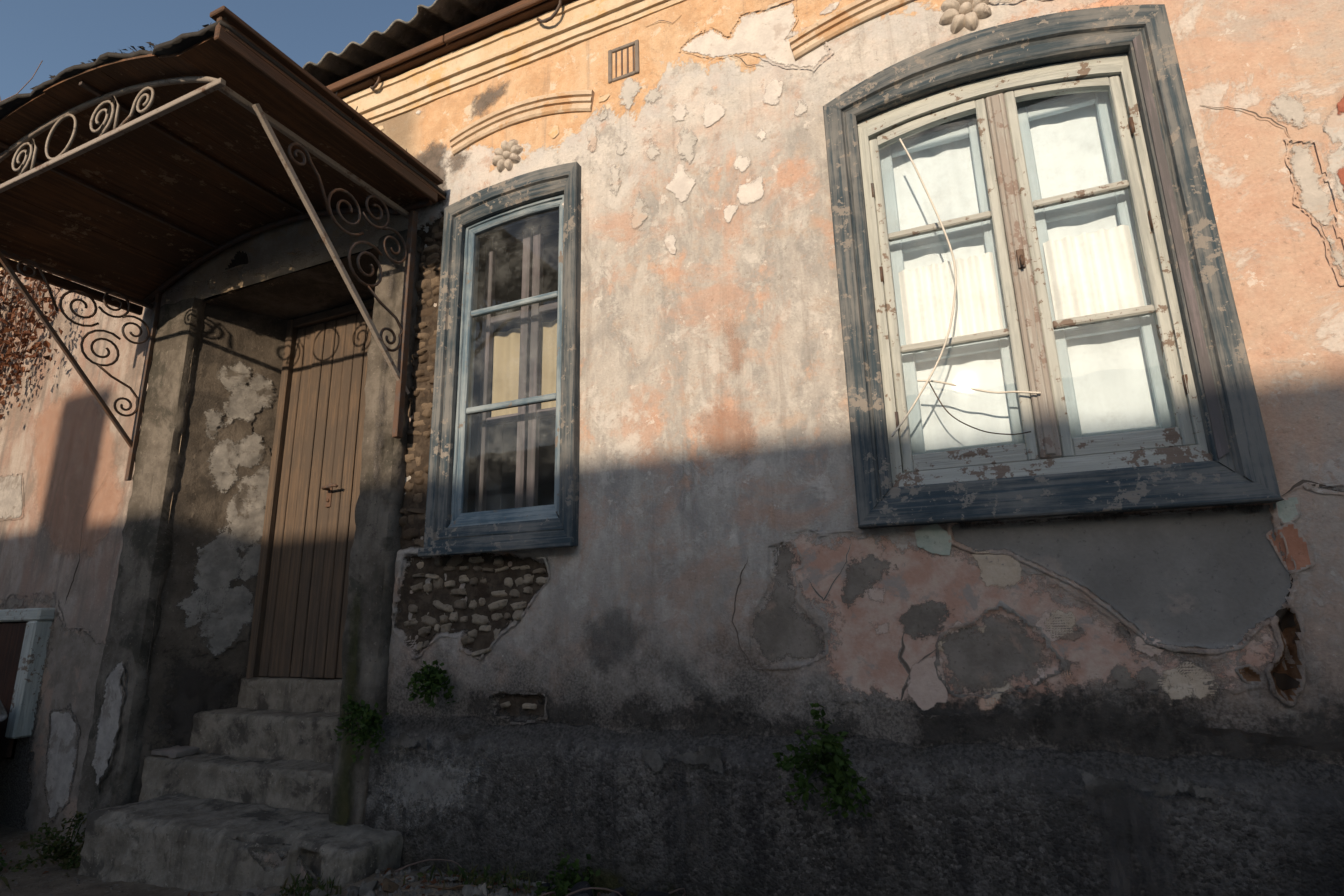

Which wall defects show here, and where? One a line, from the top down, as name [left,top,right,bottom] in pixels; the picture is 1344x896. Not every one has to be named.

peeling [678,0,834,105]
crack [1200,105,1292,141]
spalling [1267,93,1344,286]
crack [1301,207,1344,277]
flaking render [391,211,550,661]
flaking render [176,361,277,659]
crack [1281,477,1344,515]
flaking render [771,524,1307,719]
flaking render [44,657,125,825]
leakage [381,751,479,815]
leakage [468,686,860,740]
leakage [905,682,1344,766]